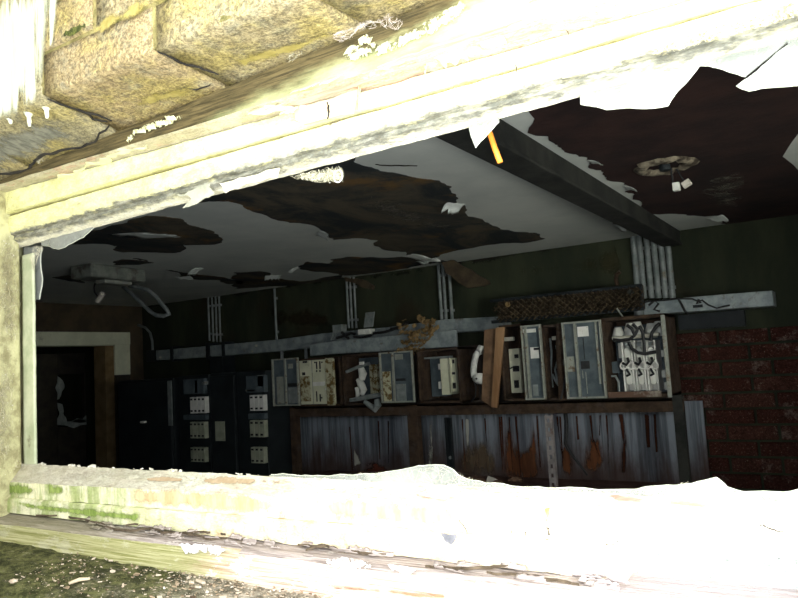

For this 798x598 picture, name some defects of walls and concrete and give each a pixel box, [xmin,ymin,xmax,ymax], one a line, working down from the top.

peeling [344,0,466,61]
water stain [0,0,69,165]
crack [0,98,112,175]
crack [157,51,219,91]
peeling [246,85,361,125]
peeling [528,38,798,224]
peeling [70,215,223,265]
peeling [168,157,545,289]
corrosion [461,416,541,478]
peeling [180,543,231,556]
peeling [325,557,371,576]